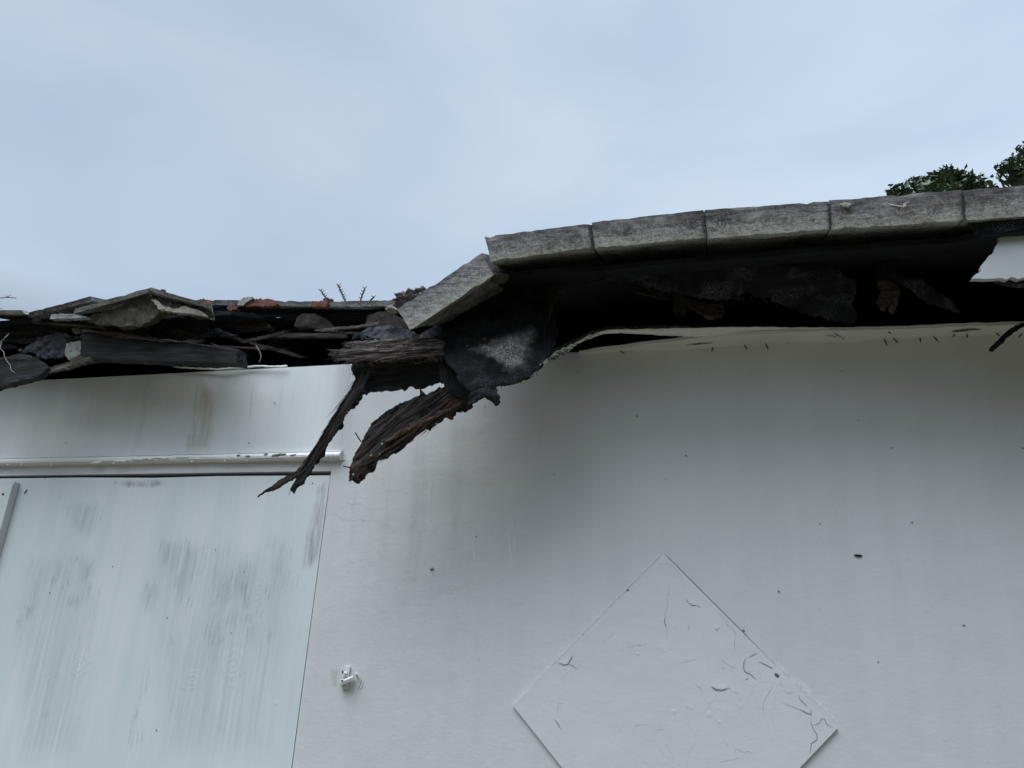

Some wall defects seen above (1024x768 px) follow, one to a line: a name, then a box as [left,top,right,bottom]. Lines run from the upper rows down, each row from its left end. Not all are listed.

crack [664,554,774,697]
crack [799,697,833,752]